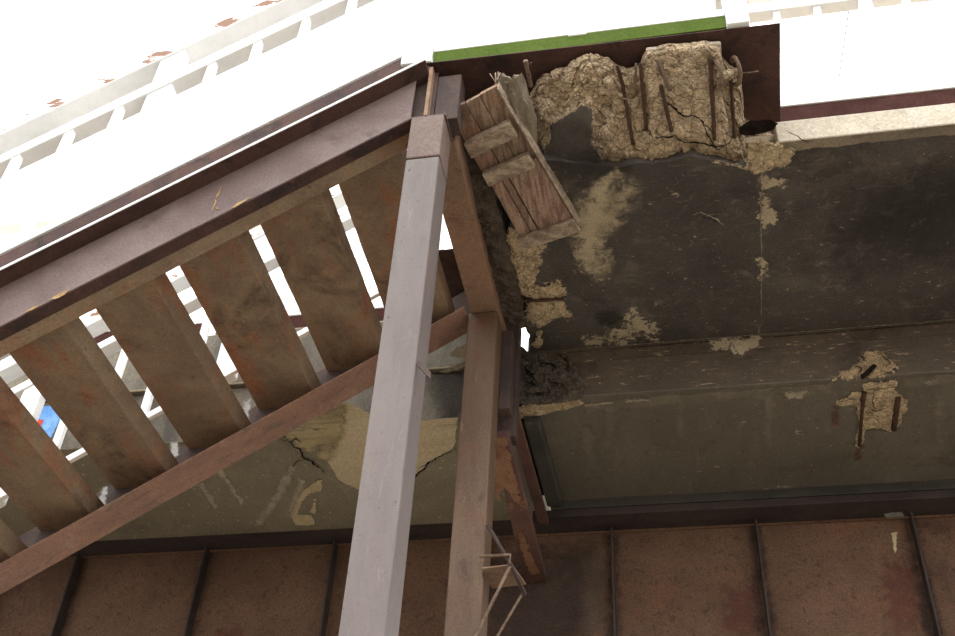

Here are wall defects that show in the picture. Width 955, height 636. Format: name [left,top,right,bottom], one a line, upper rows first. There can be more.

spalling [523,40,796,281]
crack [648,99,733,150]
spalling [460,135,613,419]
peeling [581,307,661,348]
peeling [708,334,762,359]
spalling [832,349,909,448]
crack [283,436,325,474]
peeling [320,402,370,490]
peeling [415,417,458,474]
rust [495,437,525,510]